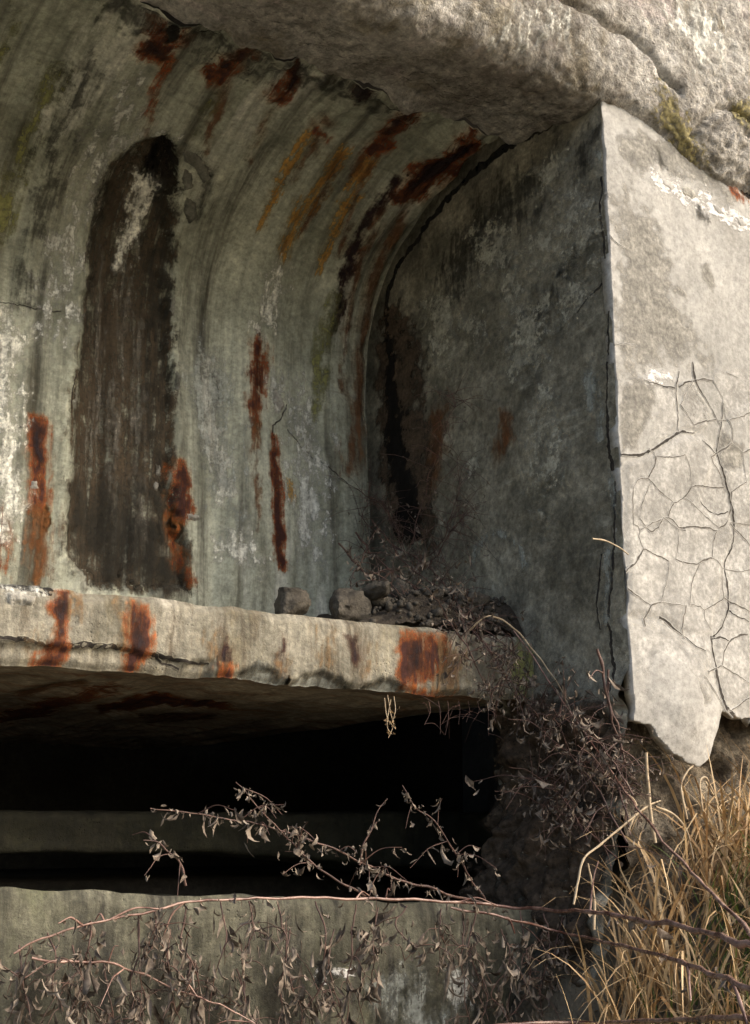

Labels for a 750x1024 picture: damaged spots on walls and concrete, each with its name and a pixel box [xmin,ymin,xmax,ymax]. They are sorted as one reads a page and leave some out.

rust [134,16,191,143]
rust [194,48,257,155]
rust [266,59,300,106]
damp [0,71,247,598]
rust [246,112,485,475]
rust [0,414,53,586]
rust [153,457,200,587]
crack [577,176,750,719]
rust [27,590,83,667]
crack [0,635,209,671]
rust [112,596,156,673]
rust [395,629,468,697]